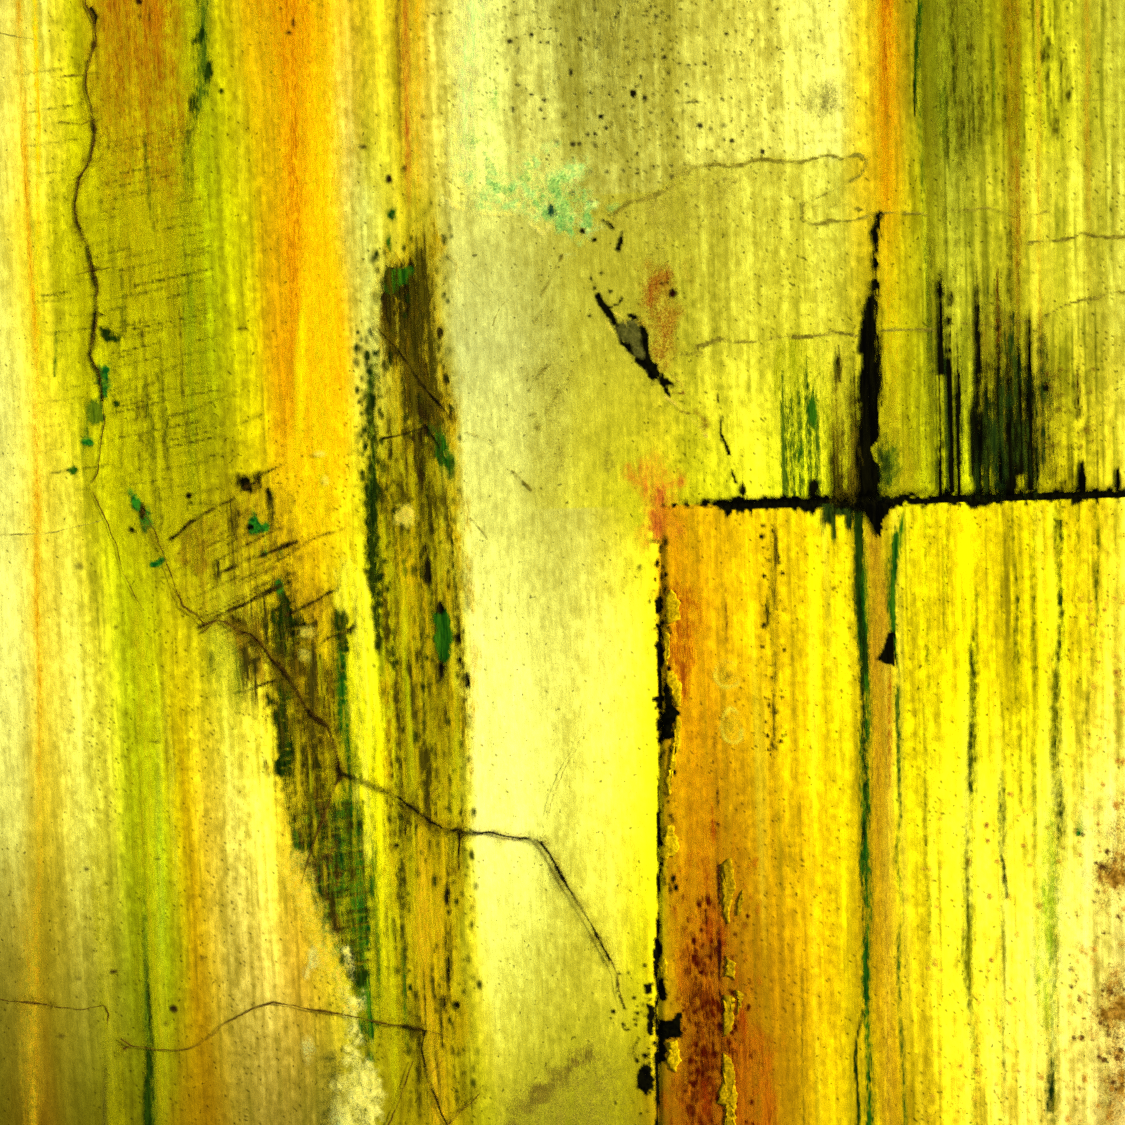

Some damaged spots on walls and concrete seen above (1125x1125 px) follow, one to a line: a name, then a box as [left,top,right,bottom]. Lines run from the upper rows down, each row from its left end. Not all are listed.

damp [613,153,868,228]
crack [11,0,144,610]
spalling [588,272,685,405]
crack [662,478,1125,541]
corrosion [670,589,697,699]
damp [674,192,1125,1125]
crack [142,509,683,1125]
crack [0,999,480,1125]
corrosion [660,896,777,1125]